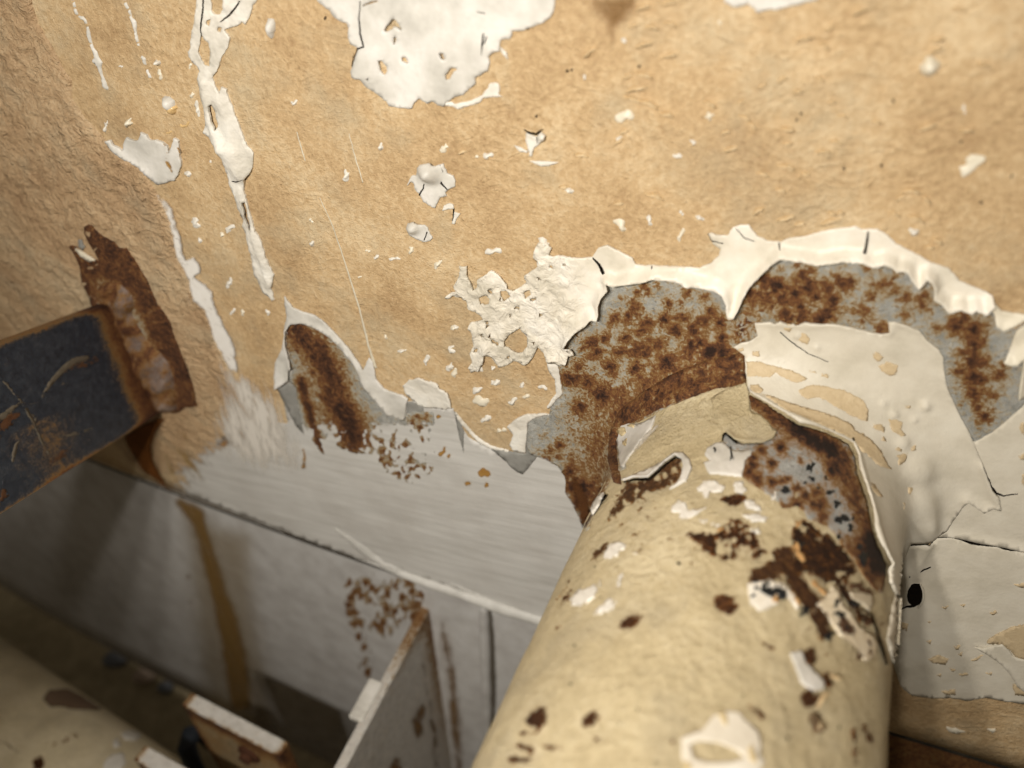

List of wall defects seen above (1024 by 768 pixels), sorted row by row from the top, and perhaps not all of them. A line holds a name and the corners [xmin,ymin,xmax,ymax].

peeling [317,0,555,109]
peeling [724,0,814,13]
peeling [514,115,558,167]
peeling [959,154,986,177]
rust [69,225,198,485]
rust [274,260,1024,553]
peeling [445,224,1024,705]
rust [590,542,608,561]
rust [343,577,424,678]
rust [619,614,642,630]
rust [667,494,874,735]
peeling [681,711,765,768]